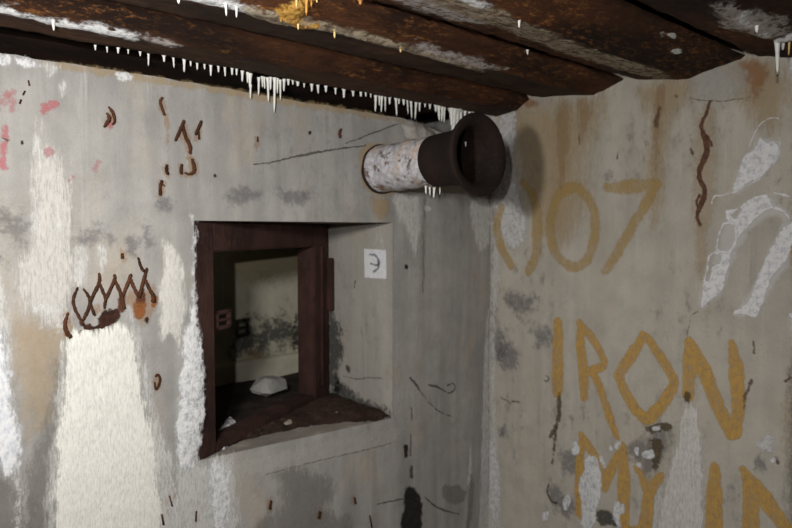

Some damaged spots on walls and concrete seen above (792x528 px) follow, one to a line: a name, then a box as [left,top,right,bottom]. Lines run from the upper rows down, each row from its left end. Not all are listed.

damp [0,0,471,130]
efflorescence [713,4,792,76]
damp [0,127,239,528]
damp [229,315,298,361]
mould [328,311,390,413]
damp [470,111,526,528]
damp [401,466,423,528]